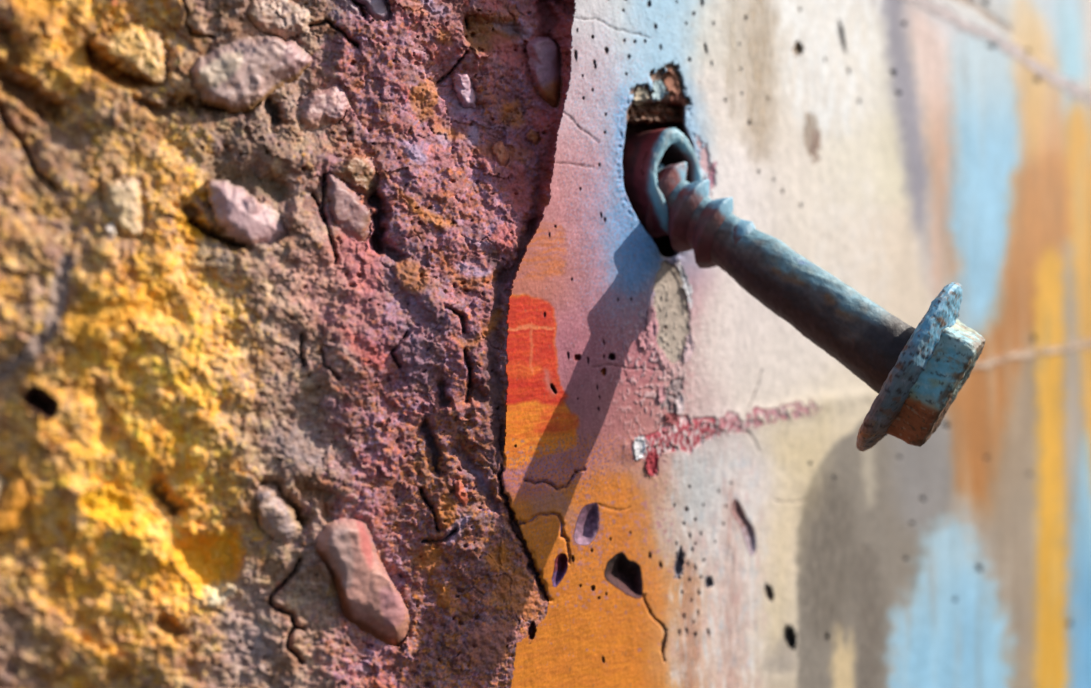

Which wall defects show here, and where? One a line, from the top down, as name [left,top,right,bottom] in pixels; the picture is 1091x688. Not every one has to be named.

spalling [630,64,690,110]
spalling [0,0,576,688]
crack [499,429,578,596]
spalling [574,503,599,545]
crack [269,558,303,664]